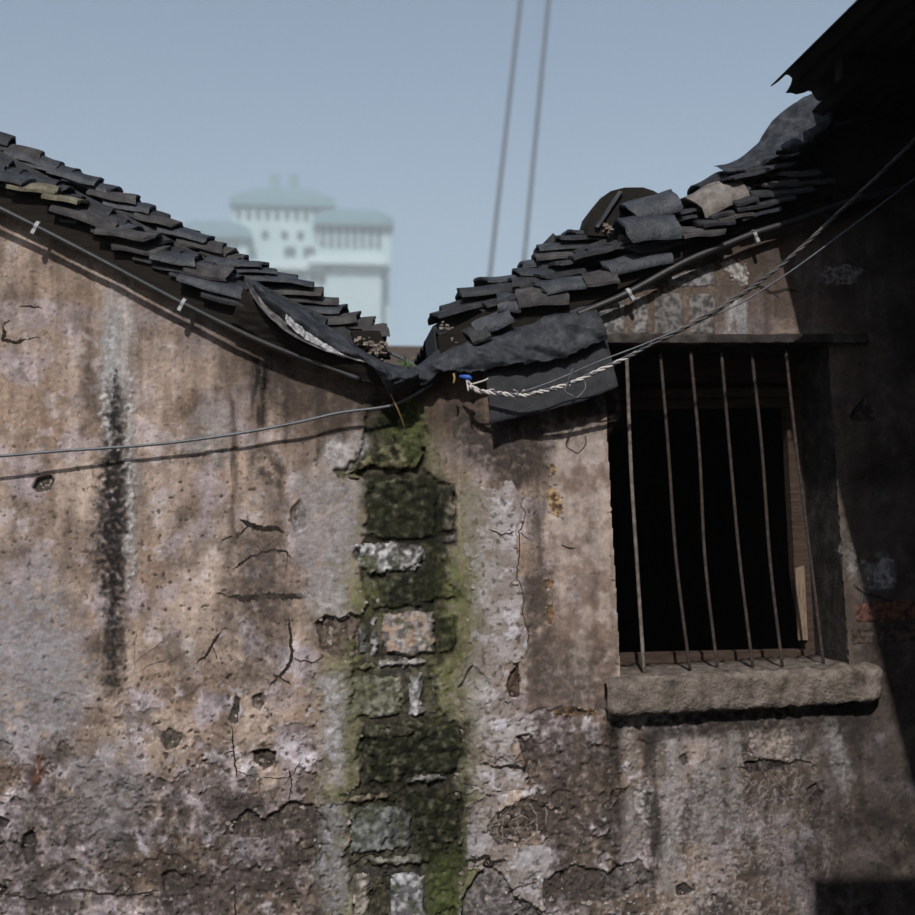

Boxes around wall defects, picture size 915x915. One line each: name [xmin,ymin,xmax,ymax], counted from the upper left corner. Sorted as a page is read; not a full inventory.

crack [1,305,41,344]
water stain [93,285,139,682]
crack [222,519,291,569]
crack [489,500,532,655]
crack [196,632,221,664]
crack [217,591,334,687]
flaking render [316,429,655,915]